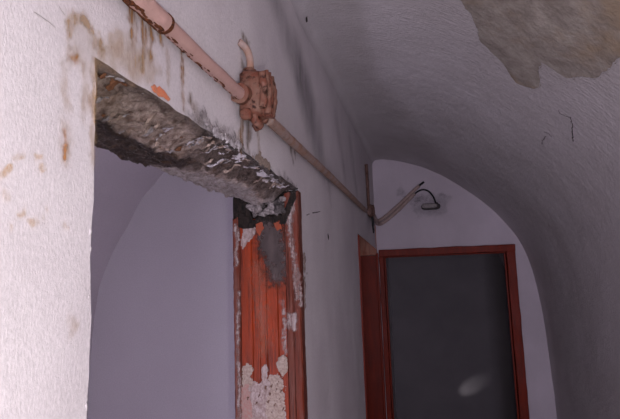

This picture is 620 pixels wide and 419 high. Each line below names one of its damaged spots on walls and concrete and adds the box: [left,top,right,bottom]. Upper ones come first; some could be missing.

peeling [460,0,620,90]
spalling [95,111,295,249]
peeling [247,379,286,419]